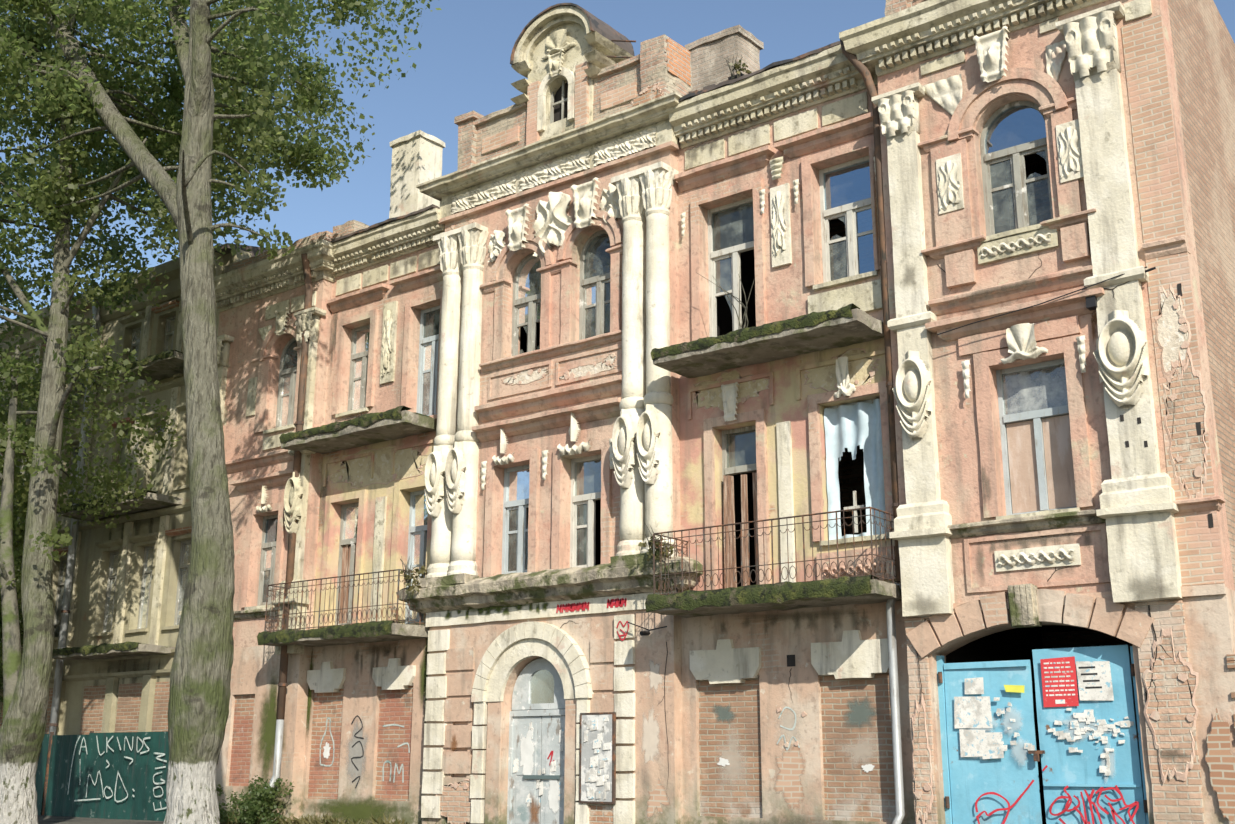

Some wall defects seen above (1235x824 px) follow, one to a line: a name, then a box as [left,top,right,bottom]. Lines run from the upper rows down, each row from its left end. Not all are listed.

flaking render [1154,283,1214,528]
water stain [446,603,548,619]
flaking render [911,695,934,824]
flaking render [1142,627,1235,824]